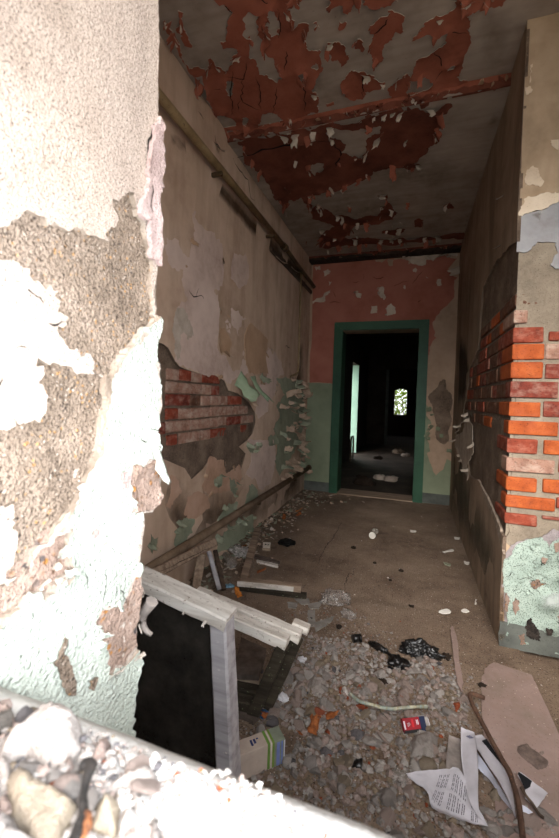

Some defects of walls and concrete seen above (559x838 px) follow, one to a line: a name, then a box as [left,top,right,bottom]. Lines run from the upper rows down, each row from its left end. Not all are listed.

peeling [0,116,314,737]
peeling [163,0,506,276]
spalling [370,287,396,316]
flaking render [423,242,559,645]